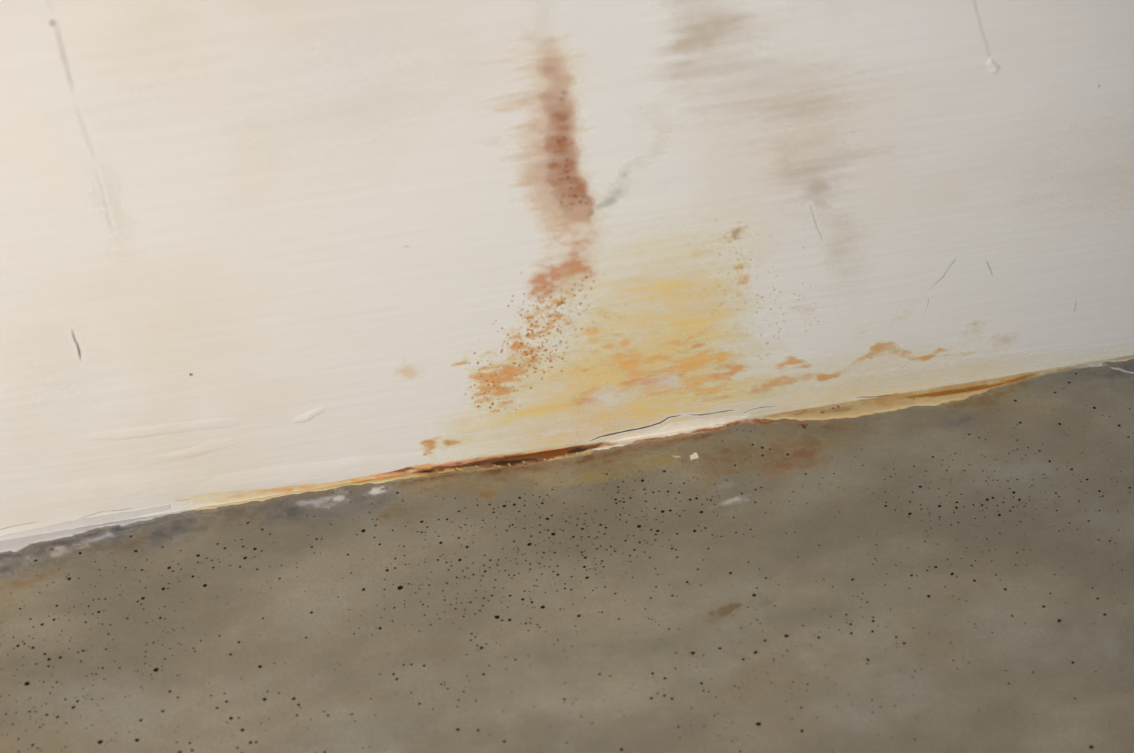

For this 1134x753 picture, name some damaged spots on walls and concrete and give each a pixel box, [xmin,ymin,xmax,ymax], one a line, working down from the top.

rust [452,37,596,413]
rust [211,357,1047,502]
crack [590,406,774,441]